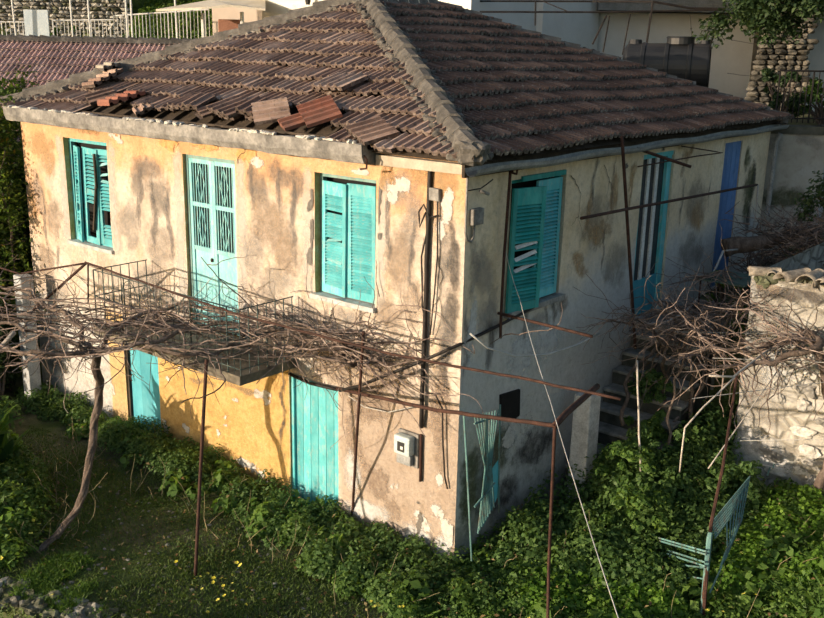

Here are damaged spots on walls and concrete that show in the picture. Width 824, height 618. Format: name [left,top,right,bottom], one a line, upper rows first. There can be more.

leakage [132,160,173,250]
leakage [249,164,302,236]
peeling [377,177,410,240]
peeling [436,187,454,240]
peeling [254,389,271,406]
leakage [460,430,506,520]
leakage [519,430,553,464]
flaking render [413,504,453,549]